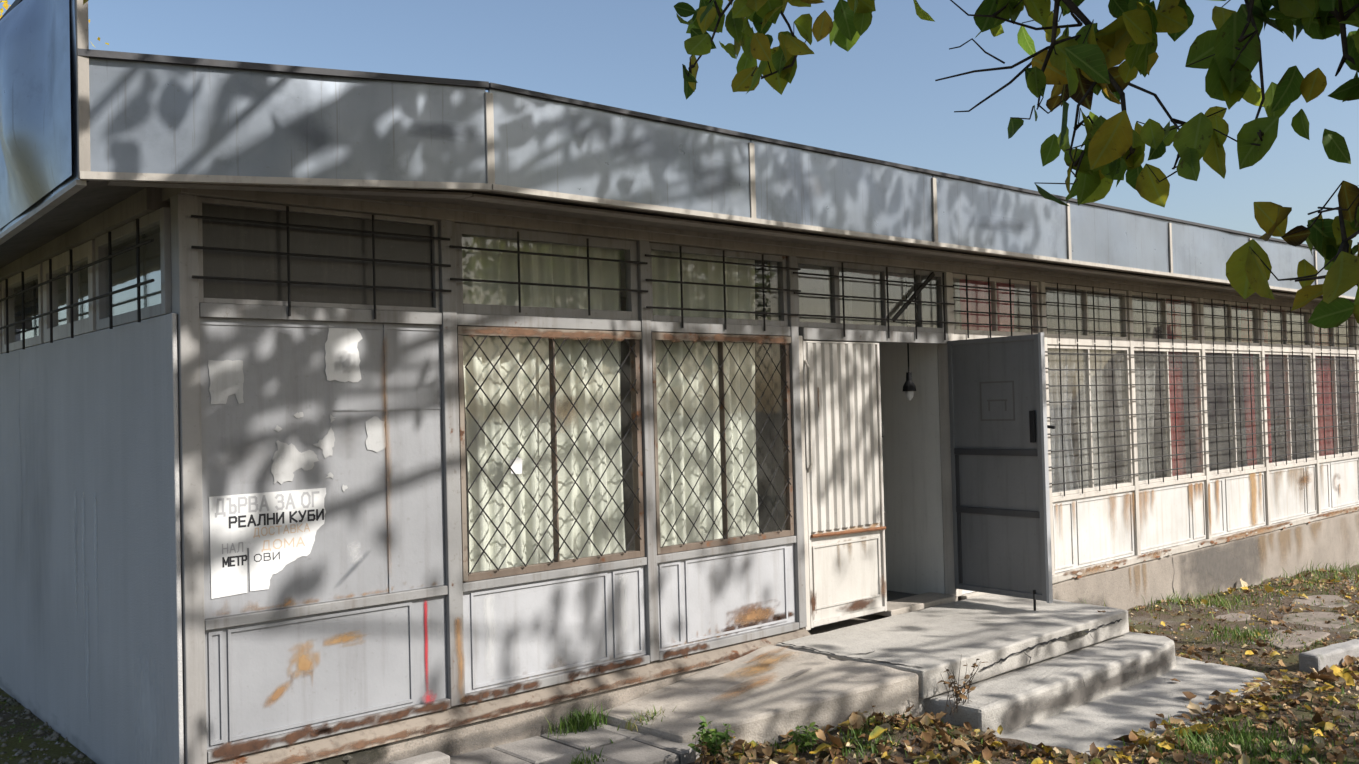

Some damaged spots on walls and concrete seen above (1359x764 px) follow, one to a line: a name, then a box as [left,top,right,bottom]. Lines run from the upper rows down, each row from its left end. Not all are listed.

rust [1111,491,1154,516]
rust [1189,480,1219,527]
rust [1250,466,1323,525]
rust [844,583,886,611]
crack [981,619,1122,670]
rust [213,605,793,764]